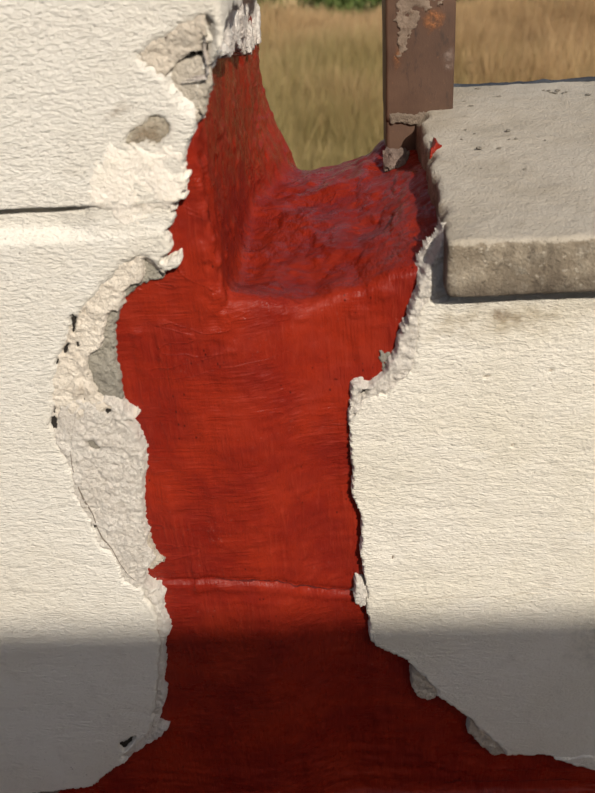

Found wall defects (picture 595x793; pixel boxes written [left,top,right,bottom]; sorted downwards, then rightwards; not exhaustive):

peeling [393,0,444,60]
spalling [137,0,262,122]
spalling [126,115,169,144]
peeling [429,137,442,160]
spalling [347,217,450,424]
spalling [51,256,172,757]
crack [214,578,350,591]
flaking render [350,573,368,607]
spalling [409,663,437,700]
spalling [466,717,505,756]